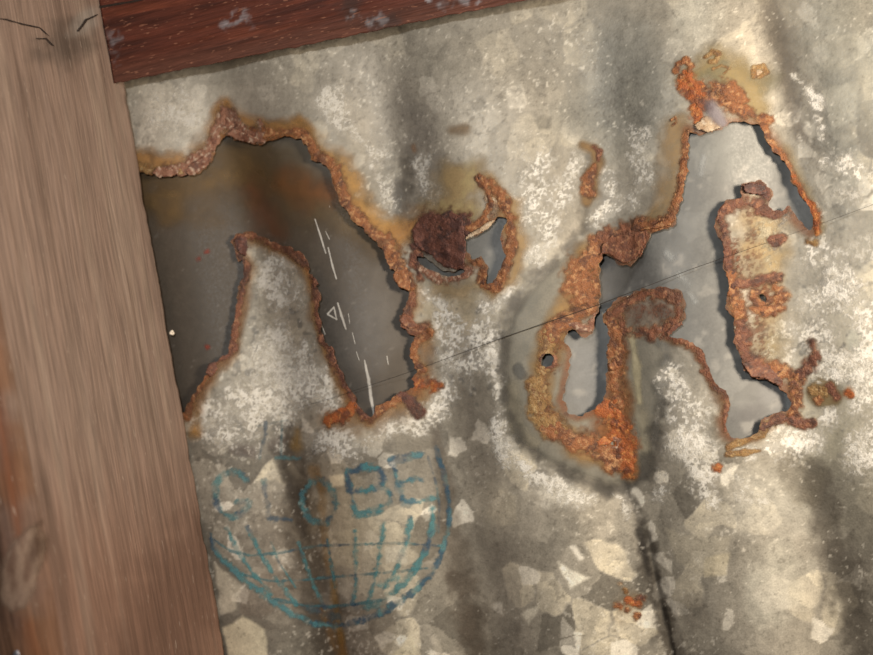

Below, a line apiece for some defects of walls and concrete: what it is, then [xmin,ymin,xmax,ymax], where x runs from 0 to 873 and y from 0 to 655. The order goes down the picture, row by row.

rust [136,49,873,510]
rust [613,583,646,621]